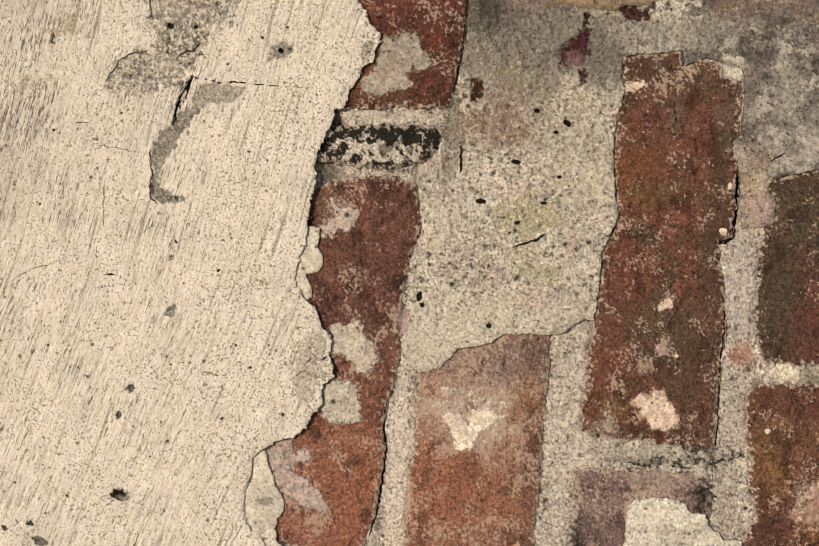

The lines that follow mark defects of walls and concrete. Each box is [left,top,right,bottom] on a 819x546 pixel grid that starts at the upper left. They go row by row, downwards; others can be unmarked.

spalling [268,41,293,61]
spalling [558,12,593,86]
spalling [619,5,650,22]
crack [172,76,303,125]
spalling [470,78,484,103]
flaking render [295,226,323,300]
peeling [290,334,330,410]
flaking render [243,449,285,546]